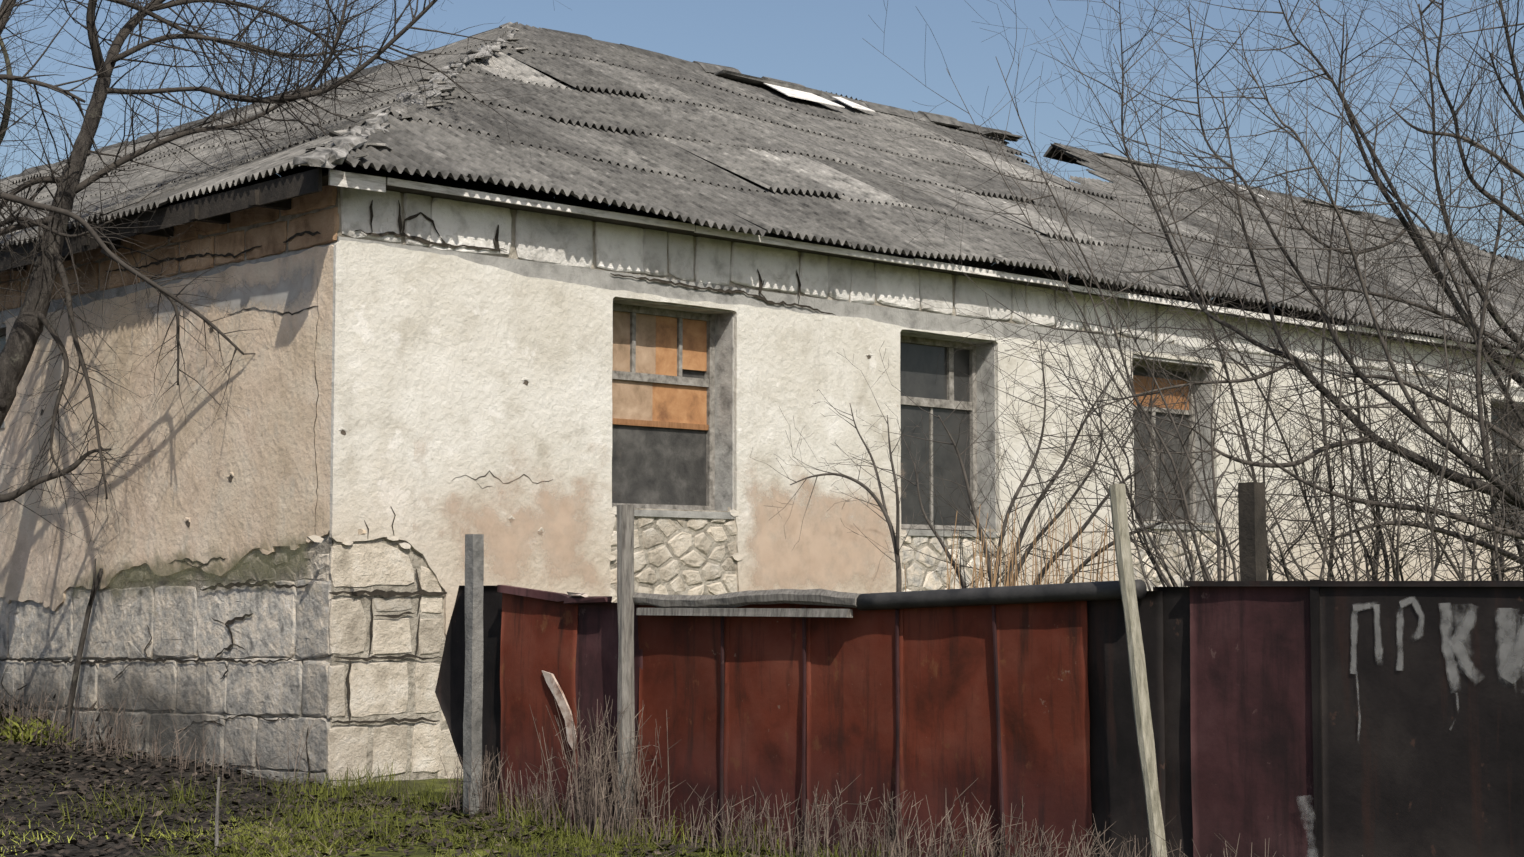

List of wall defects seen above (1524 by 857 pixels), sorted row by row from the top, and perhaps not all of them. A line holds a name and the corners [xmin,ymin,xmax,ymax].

crack [106,200,507,279]
crack [610,269,836,316]
crack [453,470,553,489]
water stain [449,491,595,583]
crack [0,557,447,780]
flaking render [3,529,449,788]